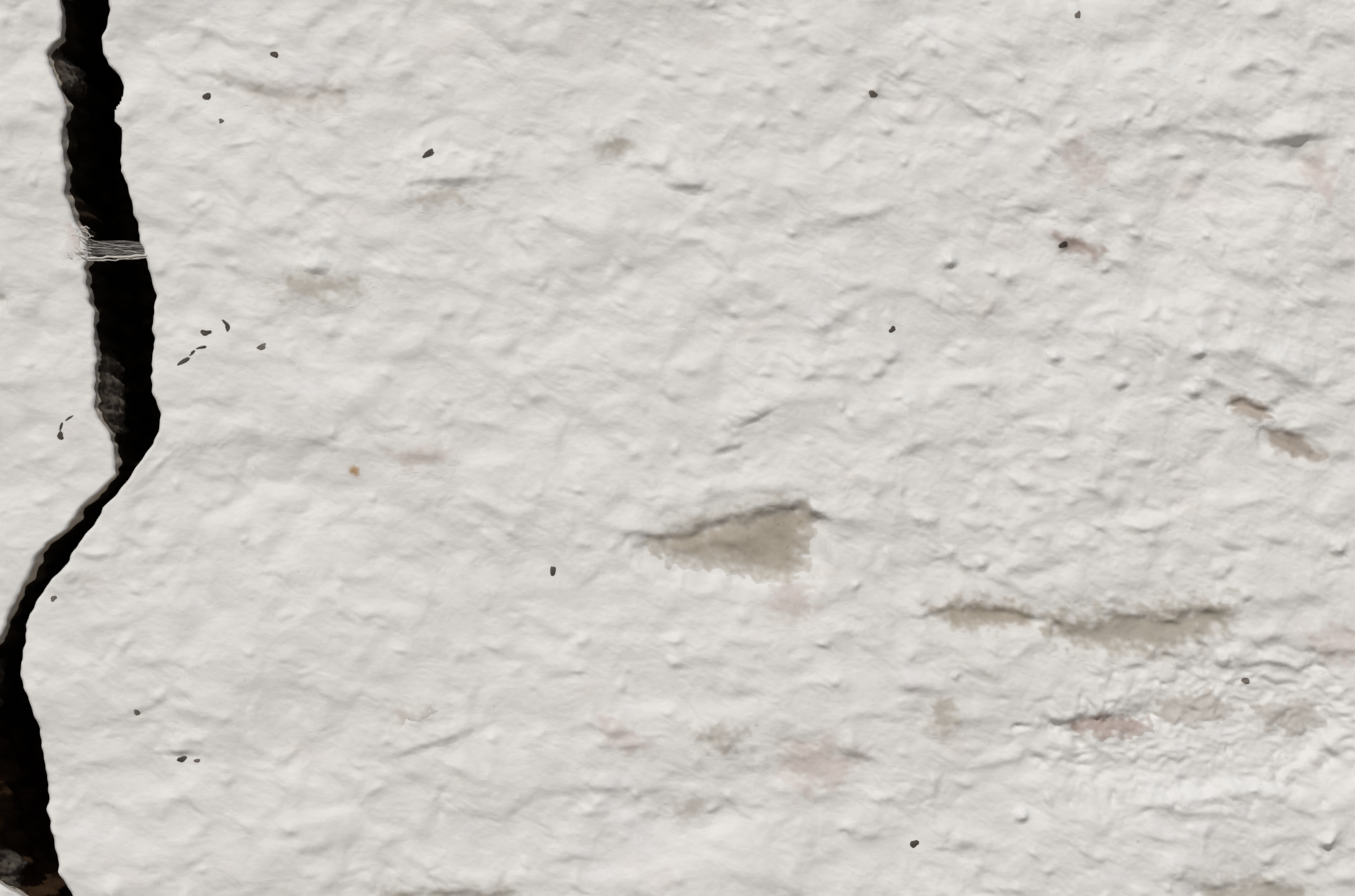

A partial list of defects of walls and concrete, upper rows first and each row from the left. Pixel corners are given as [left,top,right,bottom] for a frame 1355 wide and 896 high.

spalling [928,0,1192,31]
crack [0,0,161,896]
spalling [626,481,839,607]